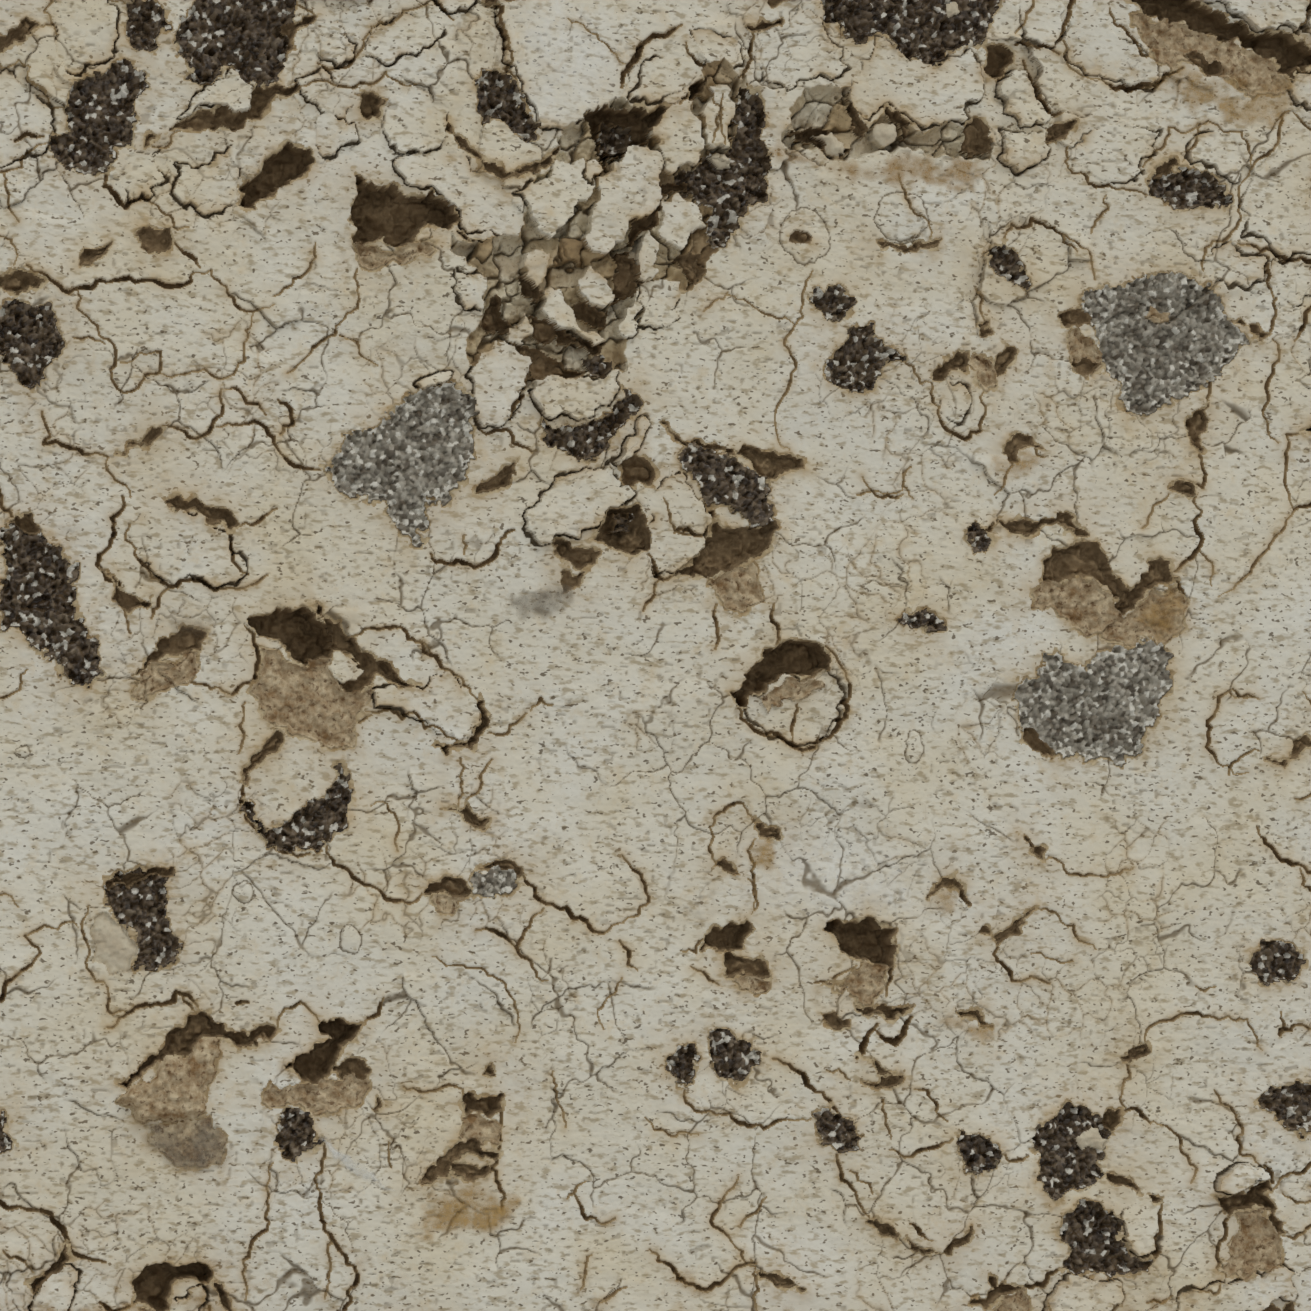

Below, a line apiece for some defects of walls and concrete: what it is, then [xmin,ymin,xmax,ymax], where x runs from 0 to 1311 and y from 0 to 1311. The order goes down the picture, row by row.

crack [0,59,379,471]
peeling [0,0,1311,617]
crack [1003,0,1311,598]
spalling [0,511,107,691]
crack [41,411,278,634]
spalling [239,600,491,856]
spalling [729,637,844,746]
spalling [962,511,1191,770]
crack [0,893,199,1029]
crack [432,855,651,1043]
crack [644,938,914,1138]
spalling [968,1098,1165,1311]